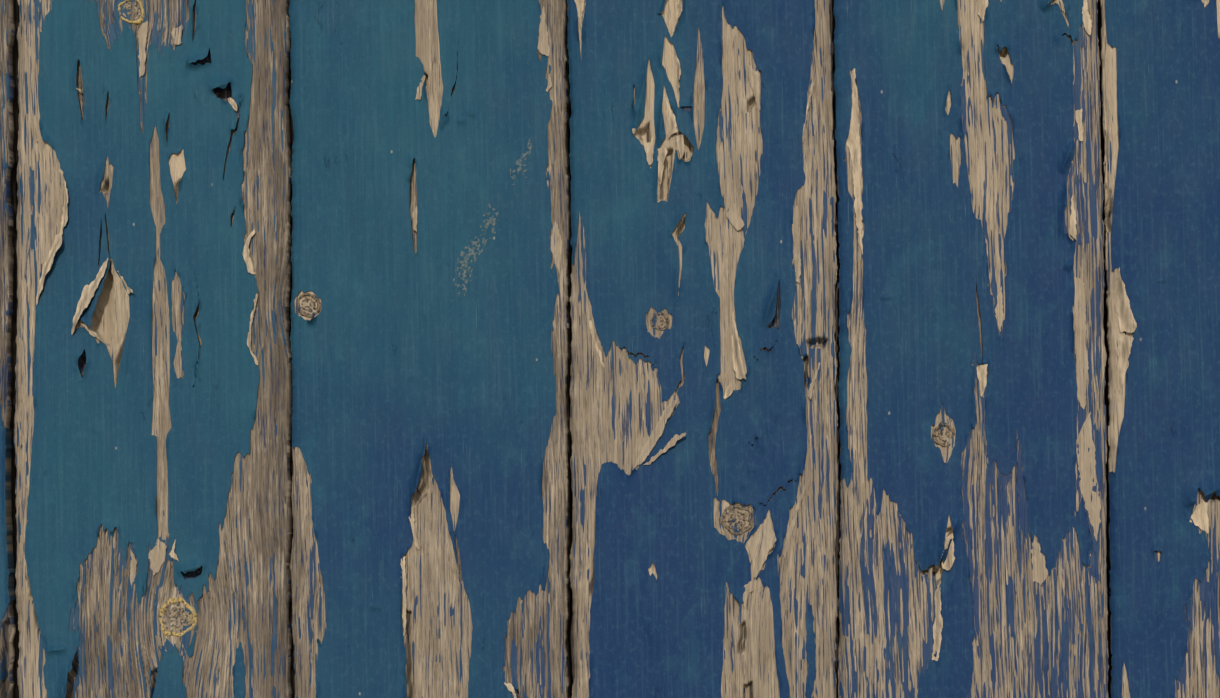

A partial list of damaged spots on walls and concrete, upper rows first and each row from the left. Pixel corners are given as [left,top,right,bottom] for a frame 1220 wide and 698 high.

peeling [0,0,68,698]
peeling [65,0,326,698]
peeling [414,0,443,137]
peeling [400,443,472,698]
peeling [503,0,686,698]
peeling [632,0,763,400]
peeling [714,0,1137,698]
peeling [1175,488,1220,698]